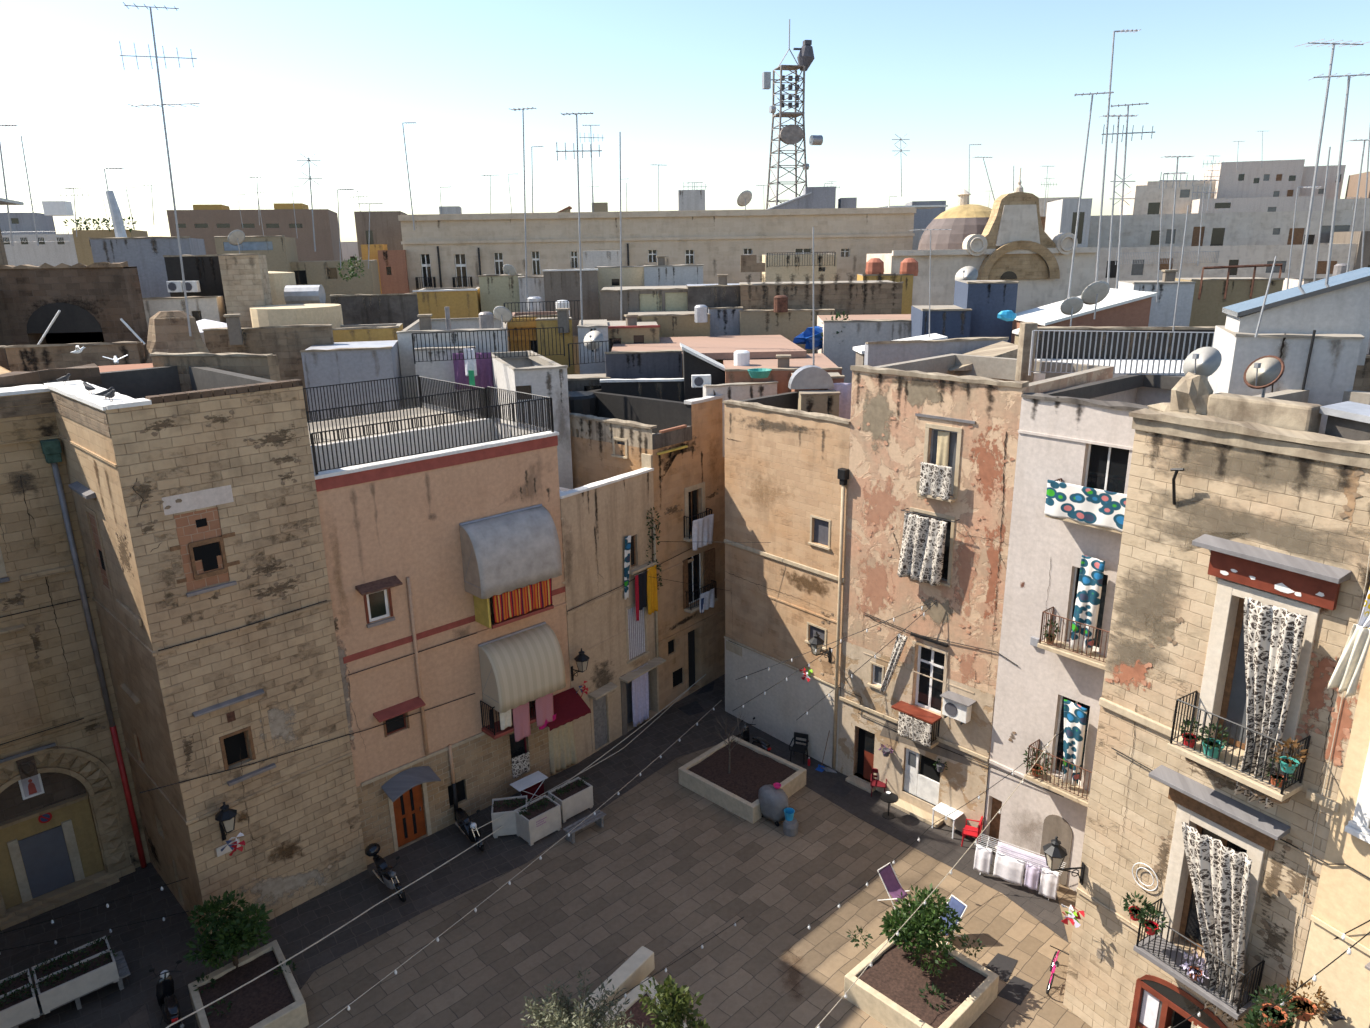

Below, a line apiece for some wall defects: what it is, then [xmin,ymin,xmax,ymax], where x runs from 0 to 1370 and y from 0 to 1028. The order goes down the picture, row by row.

peeling [857,378,943,452]
damp [1152,433,1354,492]
peeling [856,469,903,630]
peeling [912,424,1015,683]
damp [1157,493,1361,561]
damp [1108,569,1180,671]
spalling [1295,640,1359,766]